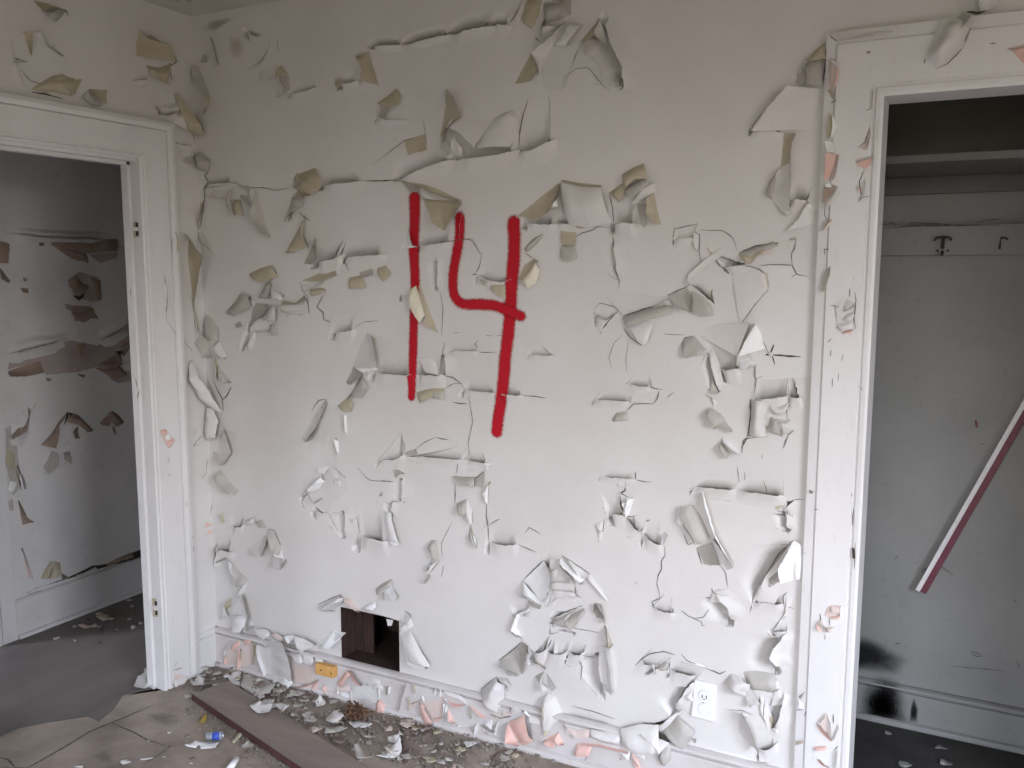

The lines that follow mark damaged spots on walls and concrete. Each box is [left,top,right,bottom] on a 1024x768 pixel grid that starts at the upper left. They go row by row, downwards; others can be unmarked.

peeling [0,227,125,322]
peeling [8,335,131,383]
peeling [132,30,391,354]
peeling [302,333,416,562]
crack [376,332,554,477]
peeling [331,0,641,156]
peeling [468,182,611,299]
crack [591,231,629,283]
peeling [594,211,778,389]
crack [761,213,803,277]
peeling [747,42,839,231]
spalling [173,464,842,768]